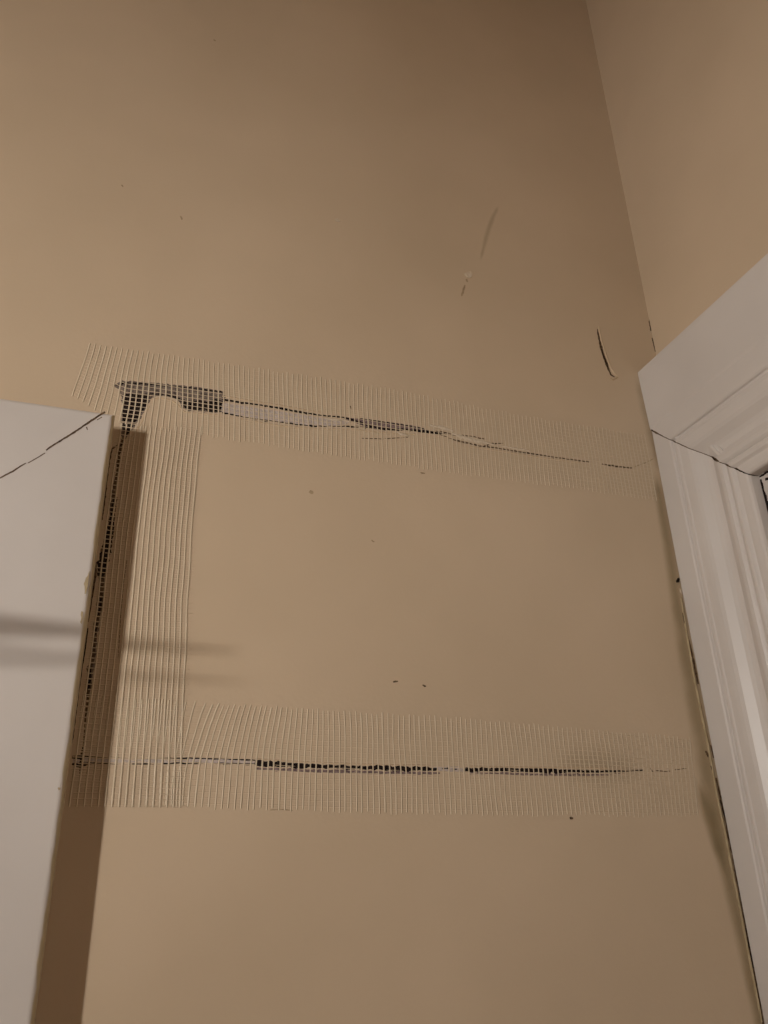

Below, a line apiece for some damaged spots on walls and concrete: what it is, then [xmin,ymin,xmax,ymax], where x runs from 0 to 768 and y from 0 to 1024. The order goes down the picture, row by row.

crack [597,329,615,377]
crack [221,395,768,511]
crack [72,437,764,1024]